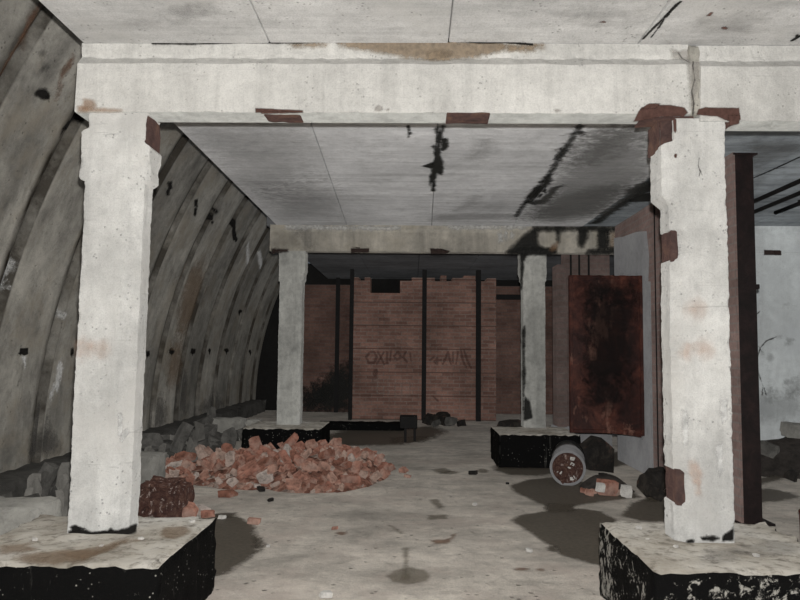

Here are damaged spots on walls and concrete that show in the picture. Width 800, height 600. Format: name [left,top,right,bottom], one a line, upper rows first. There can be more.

crack [642,1,682,40]
leakage [424,125,449,192]
leakage [515,125,583,217]